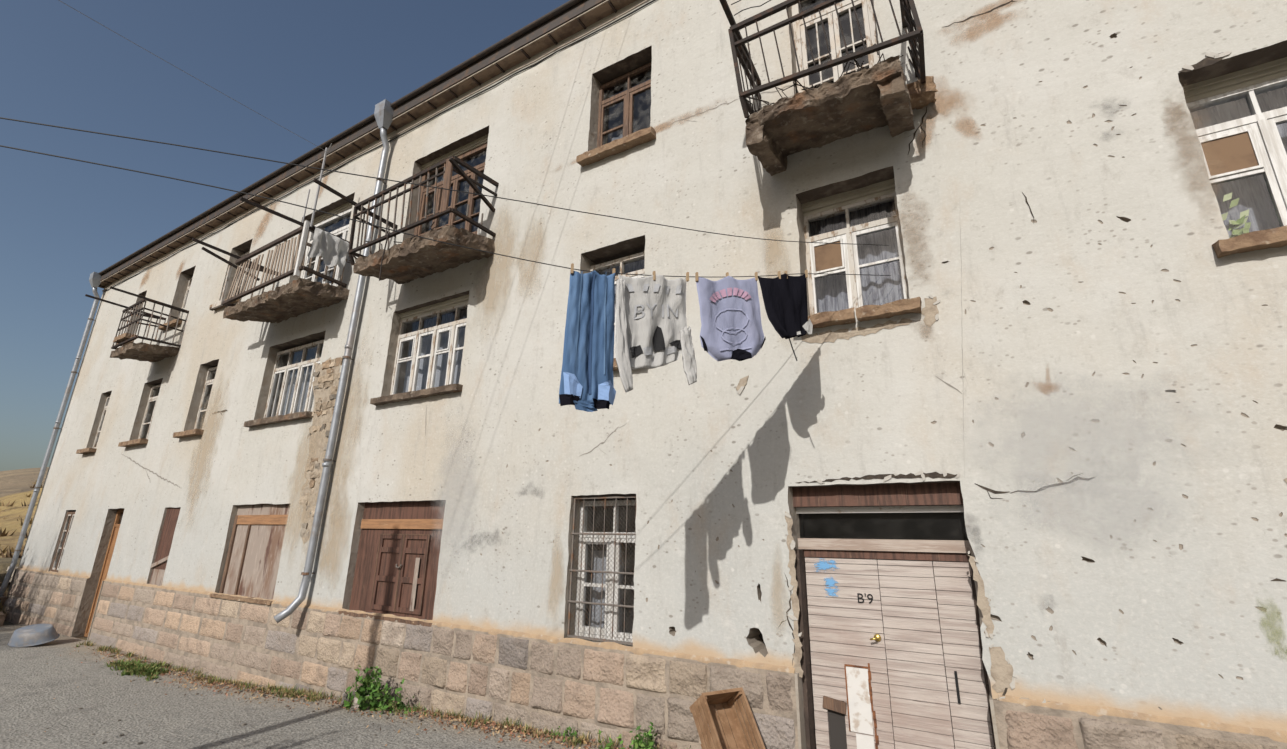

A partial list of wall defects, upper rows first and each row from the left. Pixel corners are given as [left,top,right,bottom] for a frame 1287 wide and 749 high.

crack [944,0,1016,27]
spalling [839,43,903,78]
spalling [755,80,817,112]
crack [936,200,1096,499]
flaking render [299,357,343,544]
flaking render [797,470,961,484]
flaking render [968,544,1059,705]
hole [746,628,768,657]